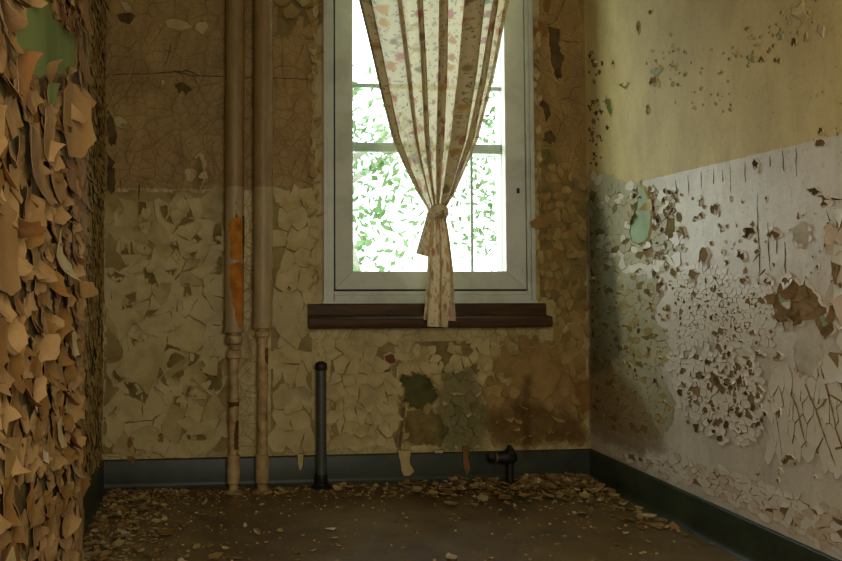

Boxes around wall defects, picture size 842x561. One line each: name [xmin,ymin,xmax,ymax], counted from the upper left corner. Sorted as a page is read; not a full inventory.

rust [228,215,244,329]
peeling [265,0,842,556]
crack [670,169,786,349]
crack [762,352,842,480]